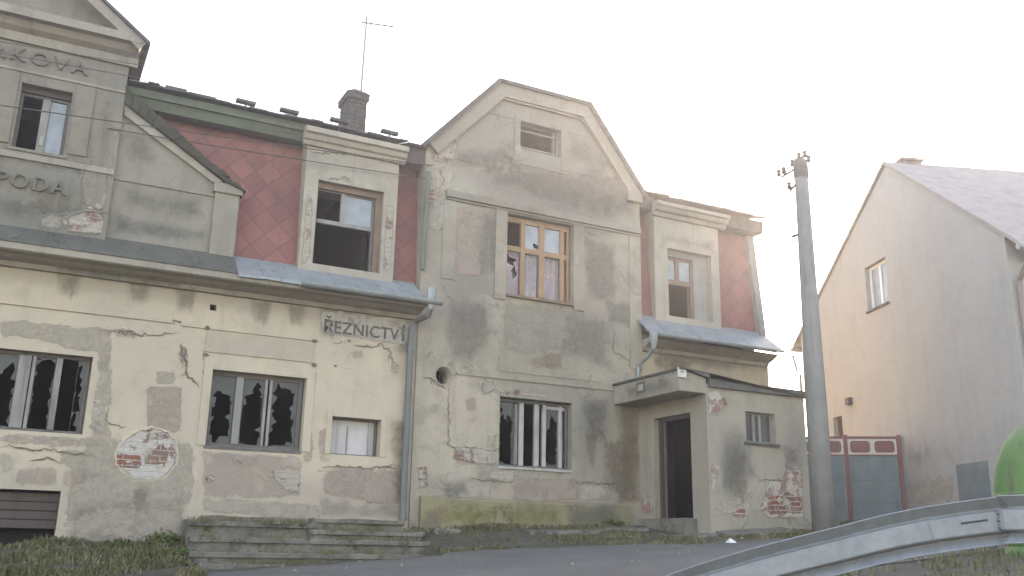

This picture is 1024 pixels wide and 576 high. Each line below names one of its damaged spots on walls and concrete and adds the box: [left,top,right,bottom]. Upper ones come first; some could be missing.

spalling [37,166,110,236]
spalling [427,162,456,204]
crack [100,319,205,387]
crack [333,341,394,363]
peeling [0,320,215,526]
crack [424,377,477,448]
spalling [708,388,729,417]
crack [0,445,90,464]
peeling [203,429,401,518]
peeling [416,444,514,498]
spalling [759,465,805,520]